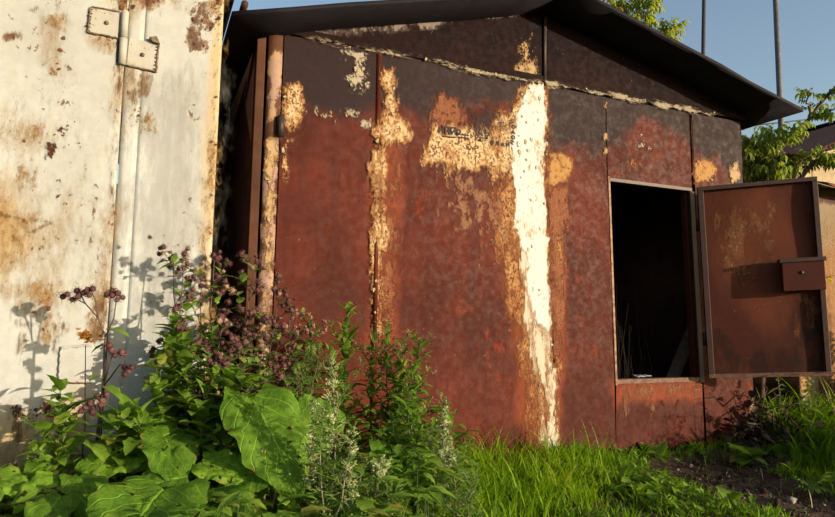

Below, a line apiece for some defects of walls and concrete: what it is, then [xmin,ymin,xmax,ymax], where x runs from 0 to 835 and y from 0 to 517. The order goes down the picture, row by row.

corrosion [3,31,39,51]
corrosion [119,0,163,11]
corrosion [185,0,226,55]
corrosion [2,121,81,160]
corrosion [114,63,156,135]
corrosion [428,92,473,131]
corrosion [261,135,279,279]
peeling [280,36,414,337]
corrosion [443,173,514,269]
corrosion [547,152,573,382]
peeling [420,33,717,459]
corrosion [3,401,56,452]